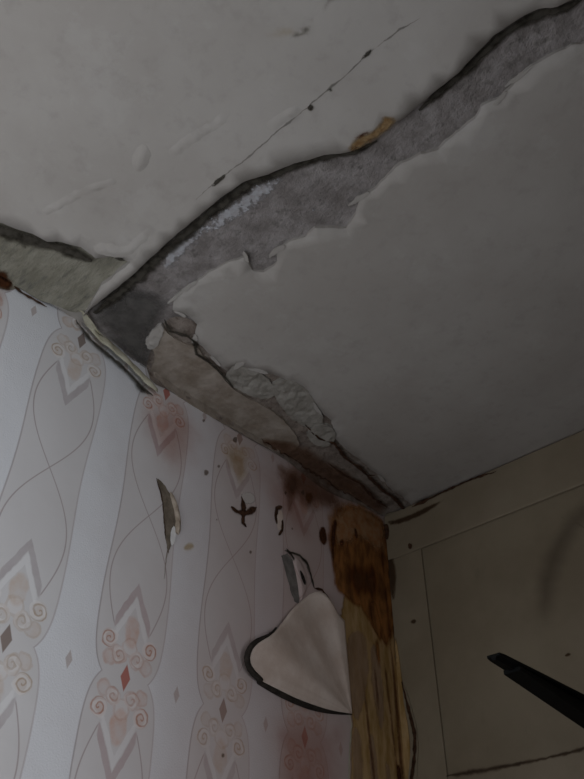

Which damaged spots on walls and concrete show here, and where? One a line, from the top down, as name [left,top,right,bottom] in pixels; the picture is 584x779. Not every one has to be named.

flaking render [0,0,584,539]
peeling [244,591,352,715]
crack [448,747,584,776]